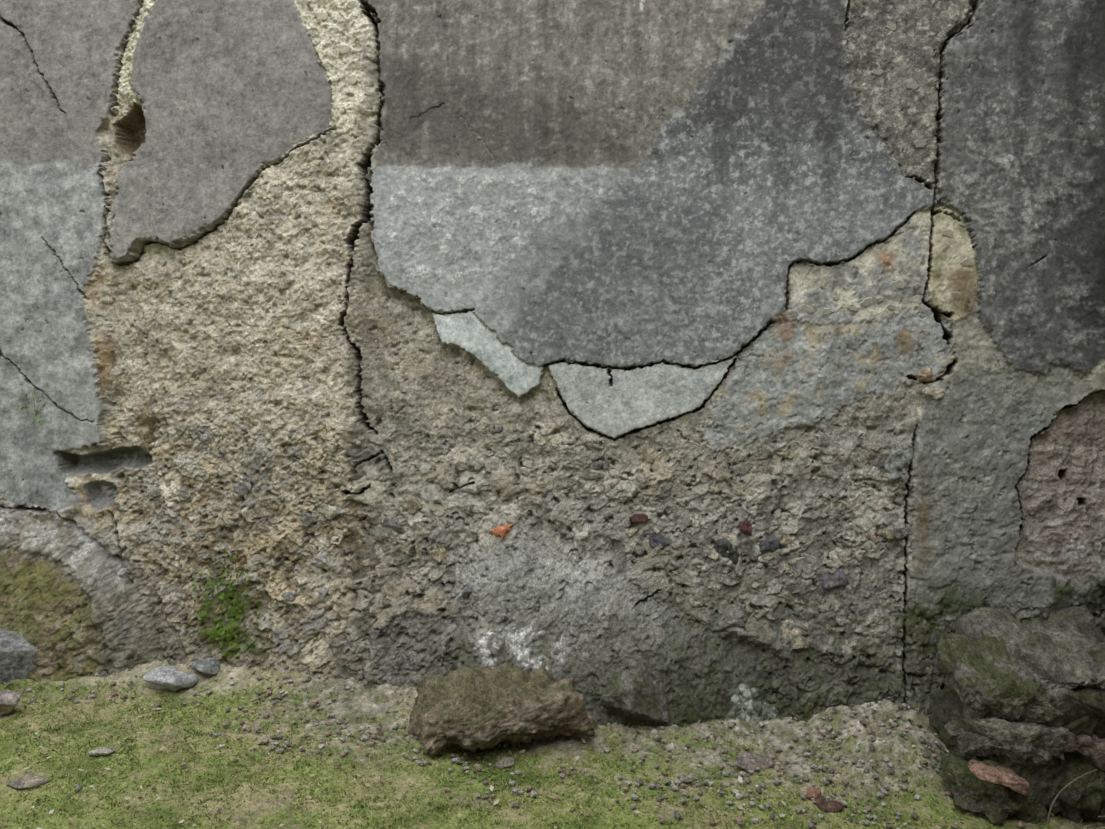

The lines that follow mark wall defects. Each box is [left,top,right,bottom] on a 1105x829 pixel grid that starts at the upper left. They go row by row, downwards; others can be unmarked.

spalling [64,0,385,681]
crack [344,363,393,496]
crack [361,0,381,73]
spalling [341,221,1105,716]
spalling [769,0,981,332]
crack [901,546,909,703]
crack [906,0,980,384]